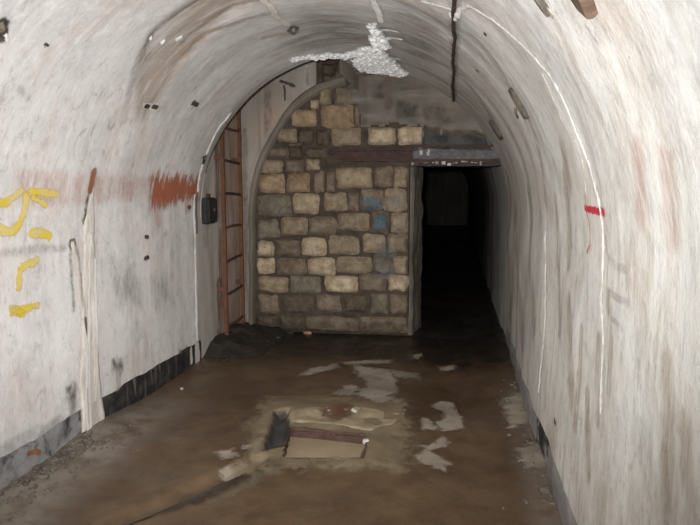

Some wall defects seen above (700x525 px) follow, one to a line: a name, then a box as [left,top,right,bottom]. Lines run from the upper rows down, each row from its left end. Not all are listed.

crack [421,0,609,416]